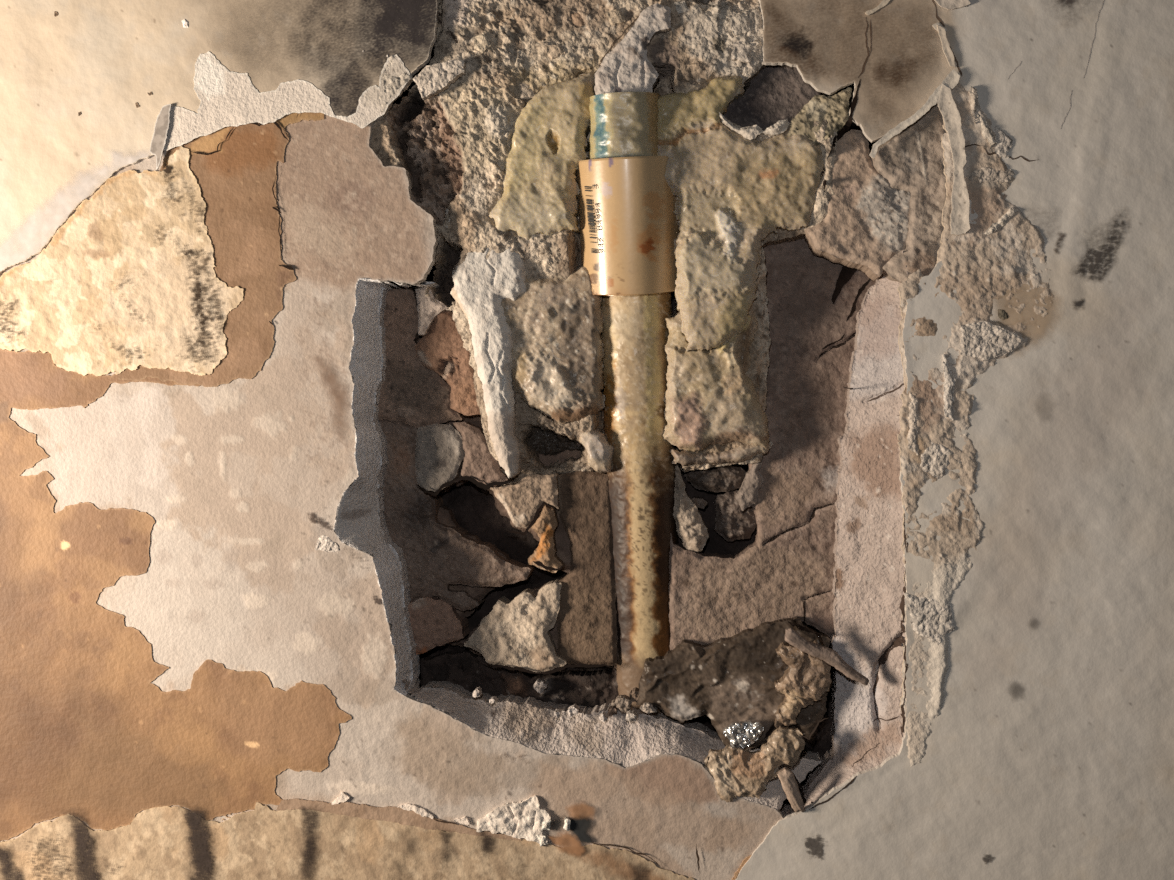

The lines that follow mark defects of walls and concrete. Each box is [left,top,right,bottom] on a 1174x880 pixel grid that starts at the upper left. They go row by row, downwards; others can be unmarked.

mould [293,0,436,117]
mould [767,6,825,74]
peeling [865,0,890,16]
mould [163,165,205,232]
spalling [745,120,837,412]
mould [176,244,223,362]
spalling [869,23,1054,770]
peeling [0,0,783,880]
leakage [0,814,124,880]
leakage [184,809,213,880]
leakage [302,808,318,880]